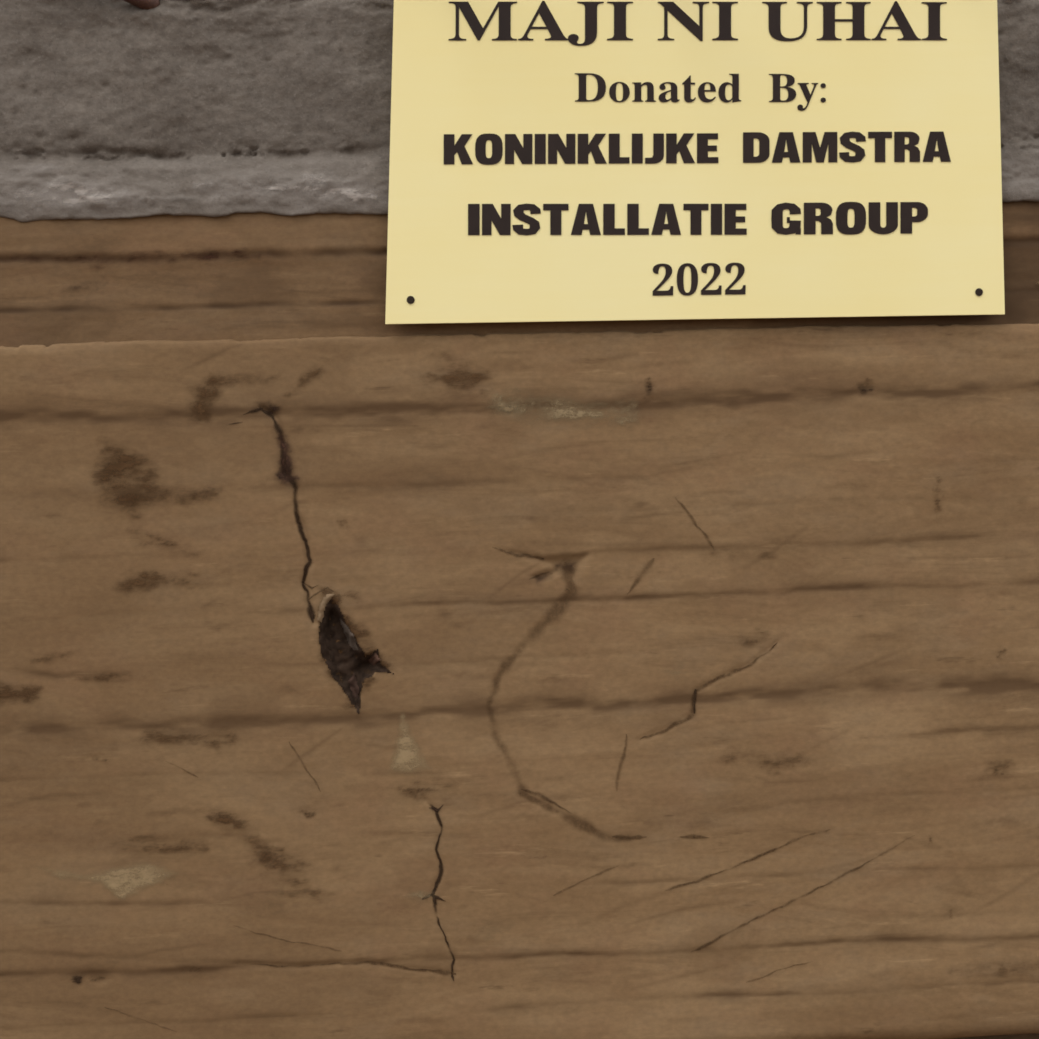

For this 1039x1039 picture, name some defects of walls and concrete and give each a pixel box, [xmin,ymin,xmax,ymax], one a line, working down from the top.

crack [232,408,333,622]
crack [620,643,777,766]
crack [322,805,456,981]
crack [520,787,642,839]